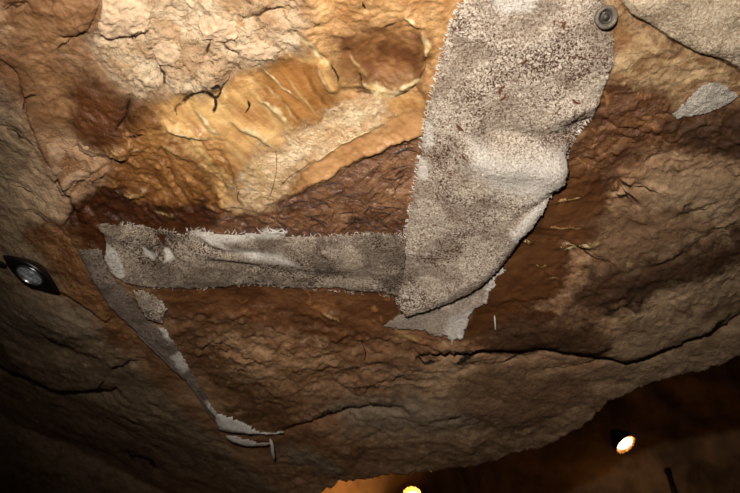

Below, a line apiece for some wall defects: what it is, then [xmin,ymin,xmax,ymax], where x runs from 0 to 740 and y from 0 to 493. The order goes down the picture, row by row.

crack [175,76,230,112]
crack [623,314,730,363]
crack [416,351,538,366]
crack [545,348,609,369]